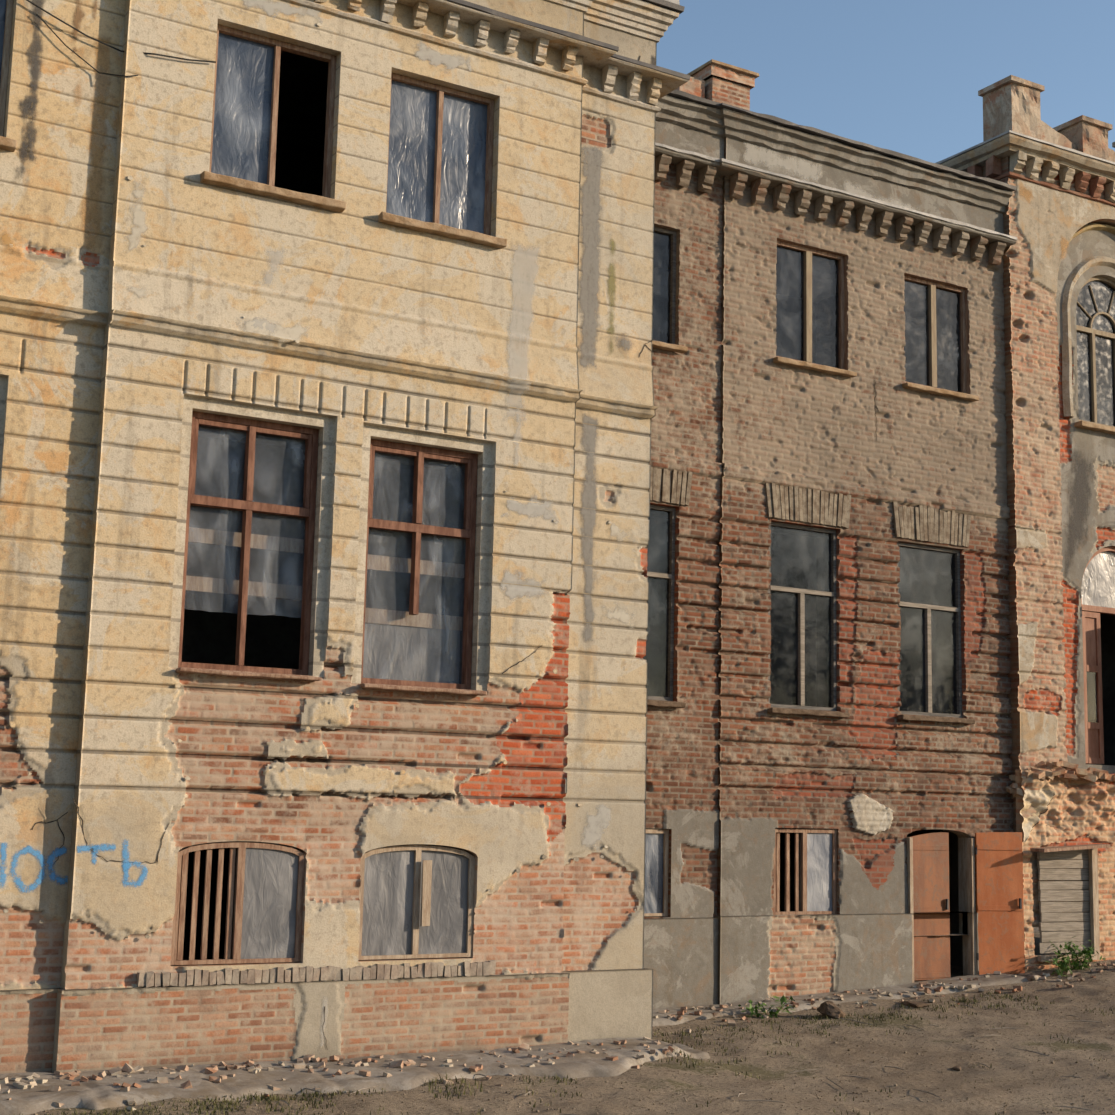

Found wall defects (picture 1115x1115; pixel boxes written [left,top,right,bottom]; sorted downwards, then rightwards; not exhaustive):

leakage [20,0,44,173]
flaking render [635,639,647,660]
flaking render [0,665,44,795]
flaking render [164,571,639,1059]
spalling [1040,835,1112,855]